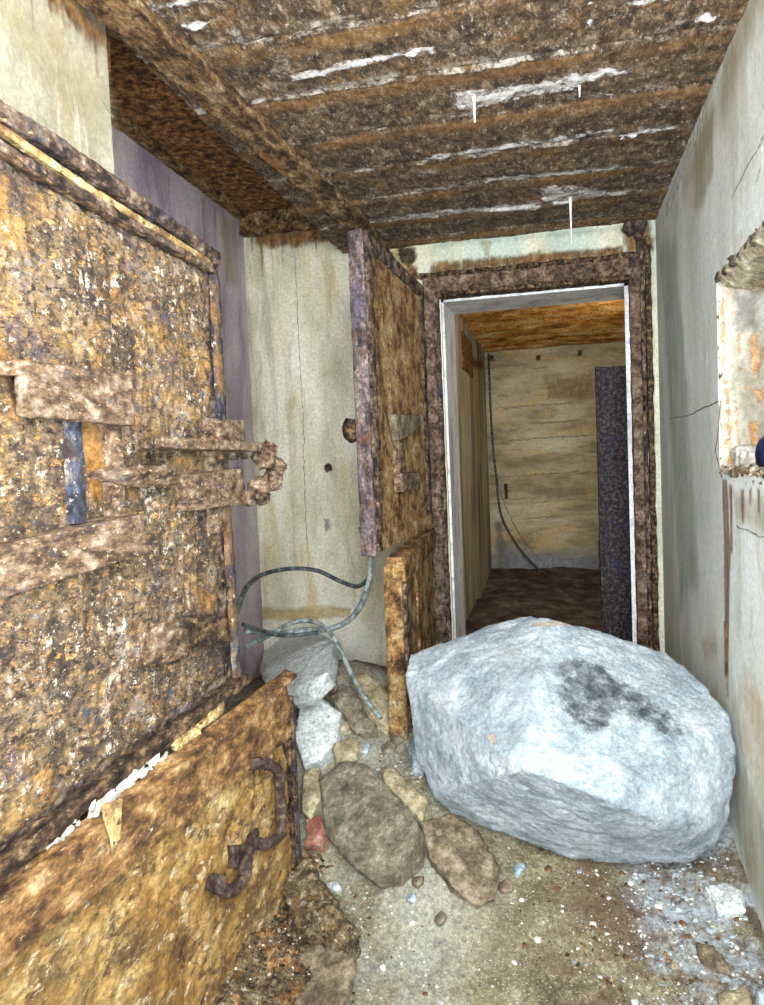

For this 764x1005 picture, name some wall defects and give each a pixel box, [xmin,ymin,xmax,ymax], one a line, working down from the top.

efflorescence [287,47,433,85]
efflorescence [450,66,632,110]
crack [731,135,764,199]
spalling [714,221,764,485]
rust [722,480,733,680]